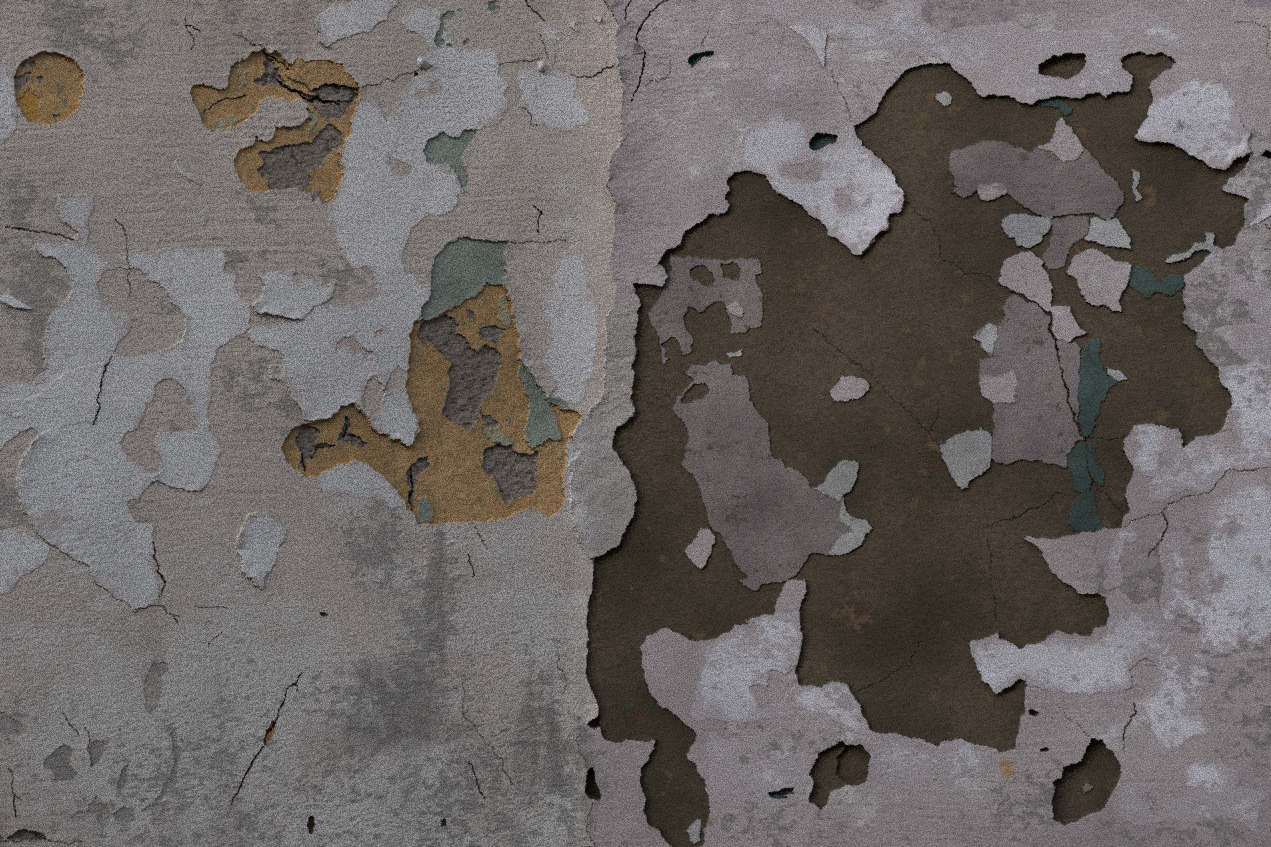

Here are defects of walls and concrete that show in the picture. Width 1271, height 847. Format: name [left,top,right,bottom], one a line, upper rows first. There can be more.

peeling [0,50,85,144]
crack [499,0,672,102]
peeling [190,0,639,558]
peeling [0,193,250,611]
spalling [585,0,1271,847]
peeling [236,513,287,589]
crack [231,672,302,805]